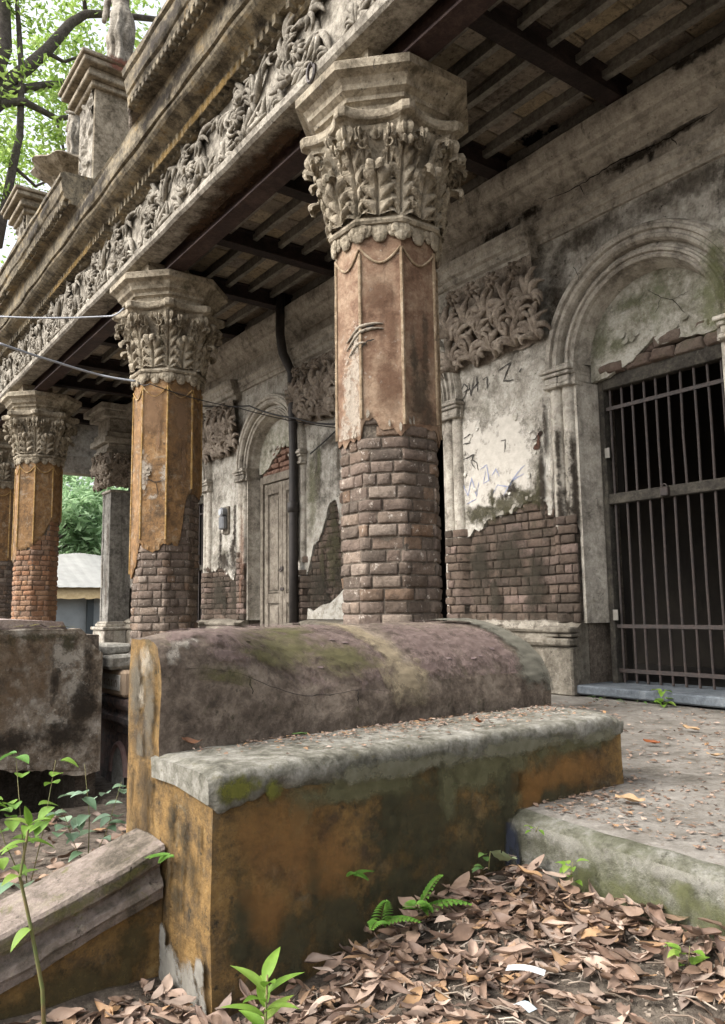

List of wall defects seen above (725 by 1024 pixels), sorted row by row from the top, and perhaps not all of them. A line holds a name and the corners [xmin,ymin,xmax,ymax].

crack [545,108,717,201]
flaking render [598,313,721,374]
flaking render [130,326,582,695]
damp [538,405,580,541]
flaking render [0,521,60,621]
damp [0,633,97,754]
peeling [159,924,206,1015]